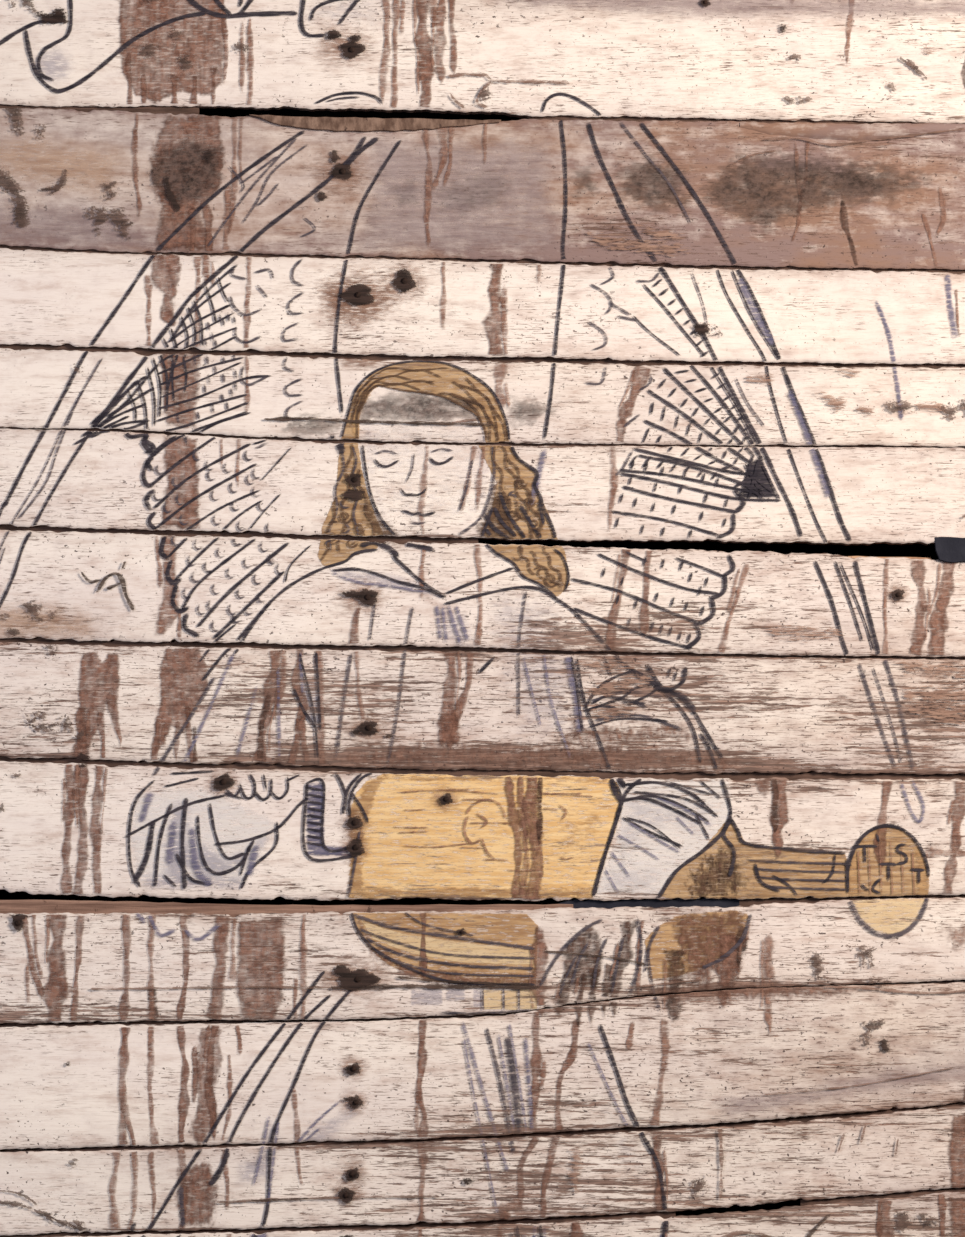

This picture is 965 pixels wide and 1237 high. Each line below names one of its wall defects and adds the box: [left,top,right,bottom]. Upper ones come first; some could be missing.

damp [714,143,897,265]
damp [922,188,946,261]
damp [119,0,254,762]